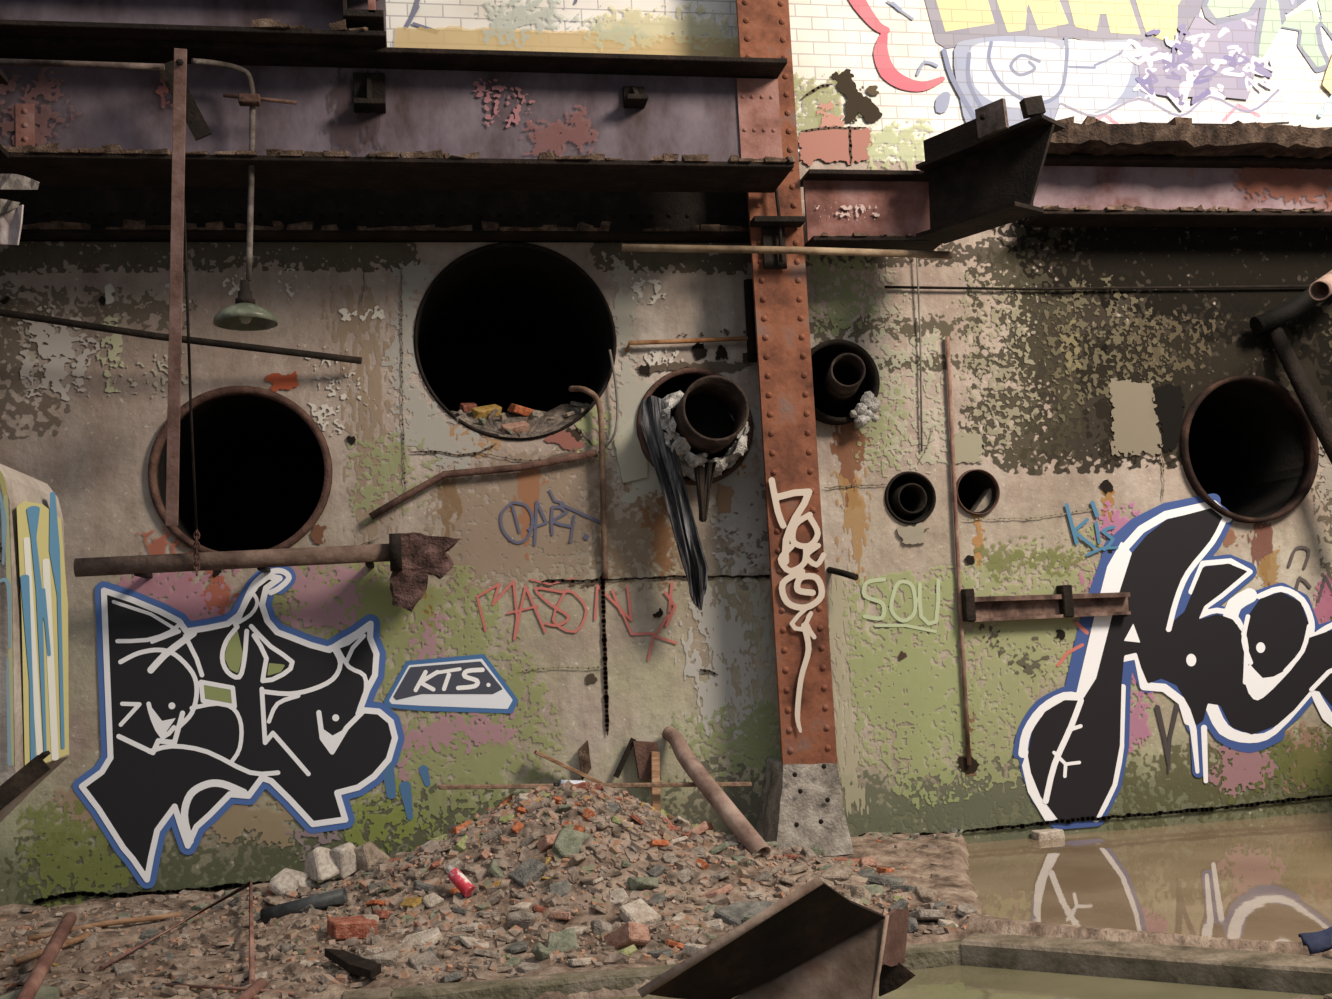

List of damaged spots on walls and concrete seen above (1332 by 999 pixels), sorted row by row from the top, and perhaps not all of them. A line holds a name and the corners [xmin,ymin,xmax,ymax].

rust [0,65,480,159]
rust [521,101,622,160]
rust [651,153,709,162]
rust [728,155,796,163]
rust [1041,167,1332,212]
peeling [17,283,188,401]
peeling [339,305,385,321]
spalling [266,346,375,436]
spalling [1152,384,1185,452]
rust [830,421,872,583]
water stain [1104,724,1332,831]